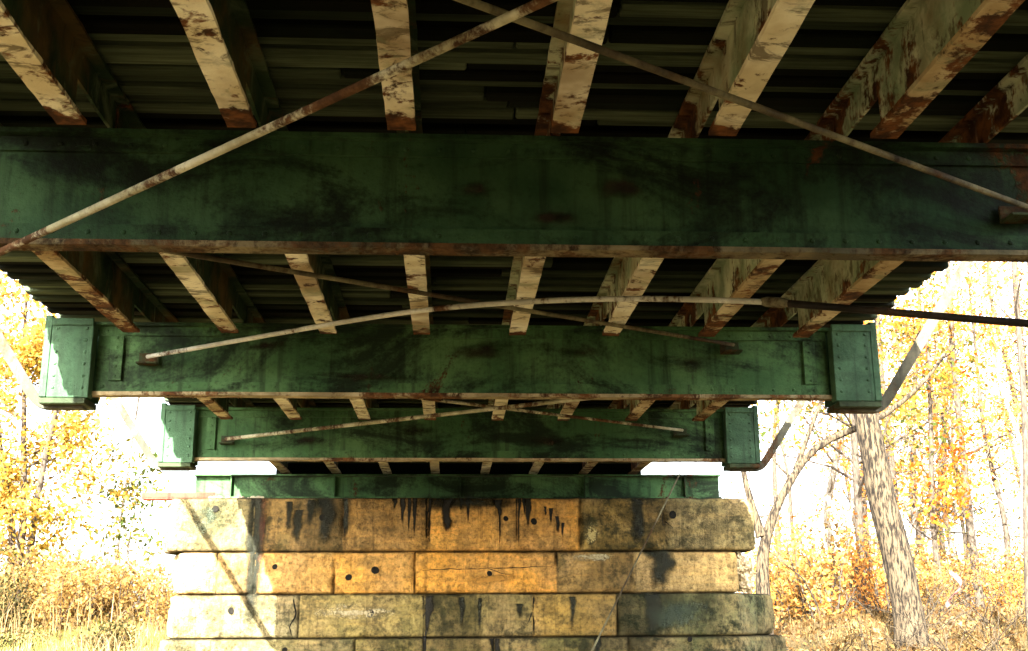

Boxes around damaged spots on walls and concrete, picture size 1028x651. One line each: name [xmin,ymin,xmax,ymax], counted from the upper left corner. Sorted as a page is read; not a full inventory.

water stain [245,499,266,613]
water stain [286,499,349,541]
water stain [393,495,565,544]
water stain [631,499,676,631]